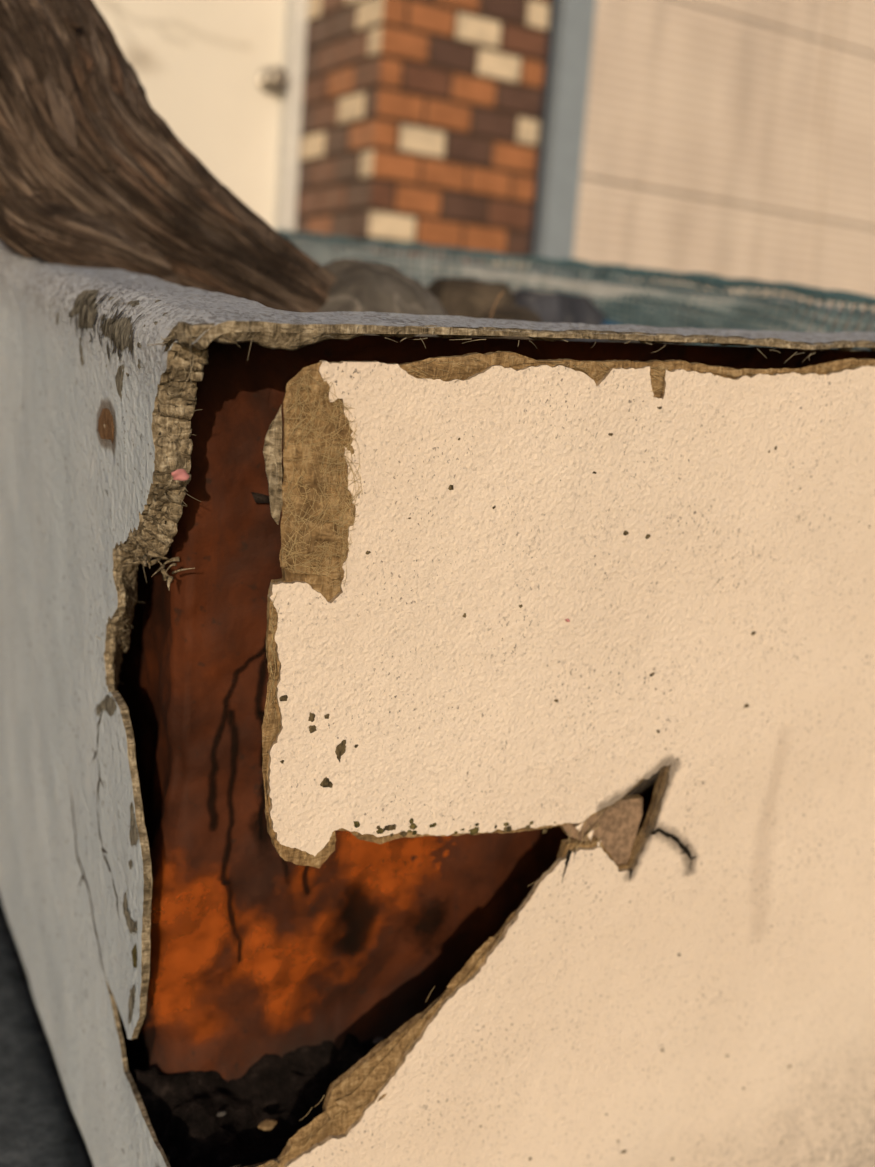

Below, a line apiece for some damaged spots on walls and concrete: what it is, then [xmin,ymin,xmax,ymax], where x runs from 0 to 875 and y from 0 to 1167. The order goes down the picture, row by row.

spalling [56,289,875,717]
spalling [262,583,288,816]
peeling [308,712,330,733]
peeling [335,740,358,762]
crack [70,711,118,973]
peeling [129,802,138,846]
peeling [376,818,437,837]
spalling [494,795,643,864]
crack [650,828,697,868]
peeling [123,890,137,968]
spalling [258,933,502,1167]